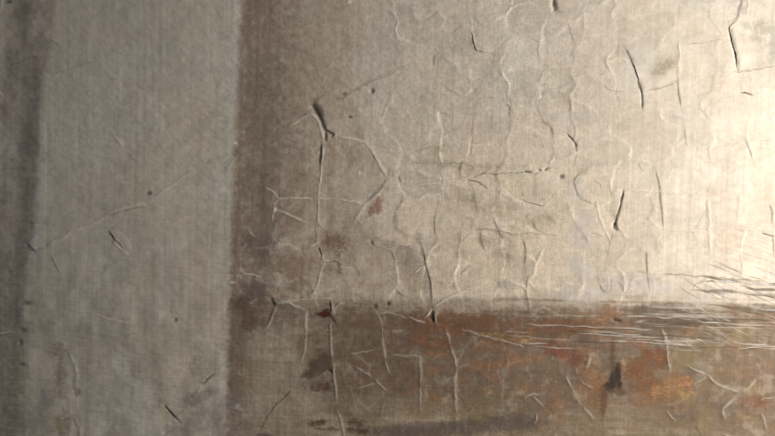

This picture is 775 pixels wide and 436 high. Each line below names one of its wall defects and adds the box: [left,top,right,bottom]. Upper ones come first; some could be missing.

crack [596,190,624,240]
crack [267,105,483,410]
corrosion [443,304,621,364]
crack [690,367,774,436]